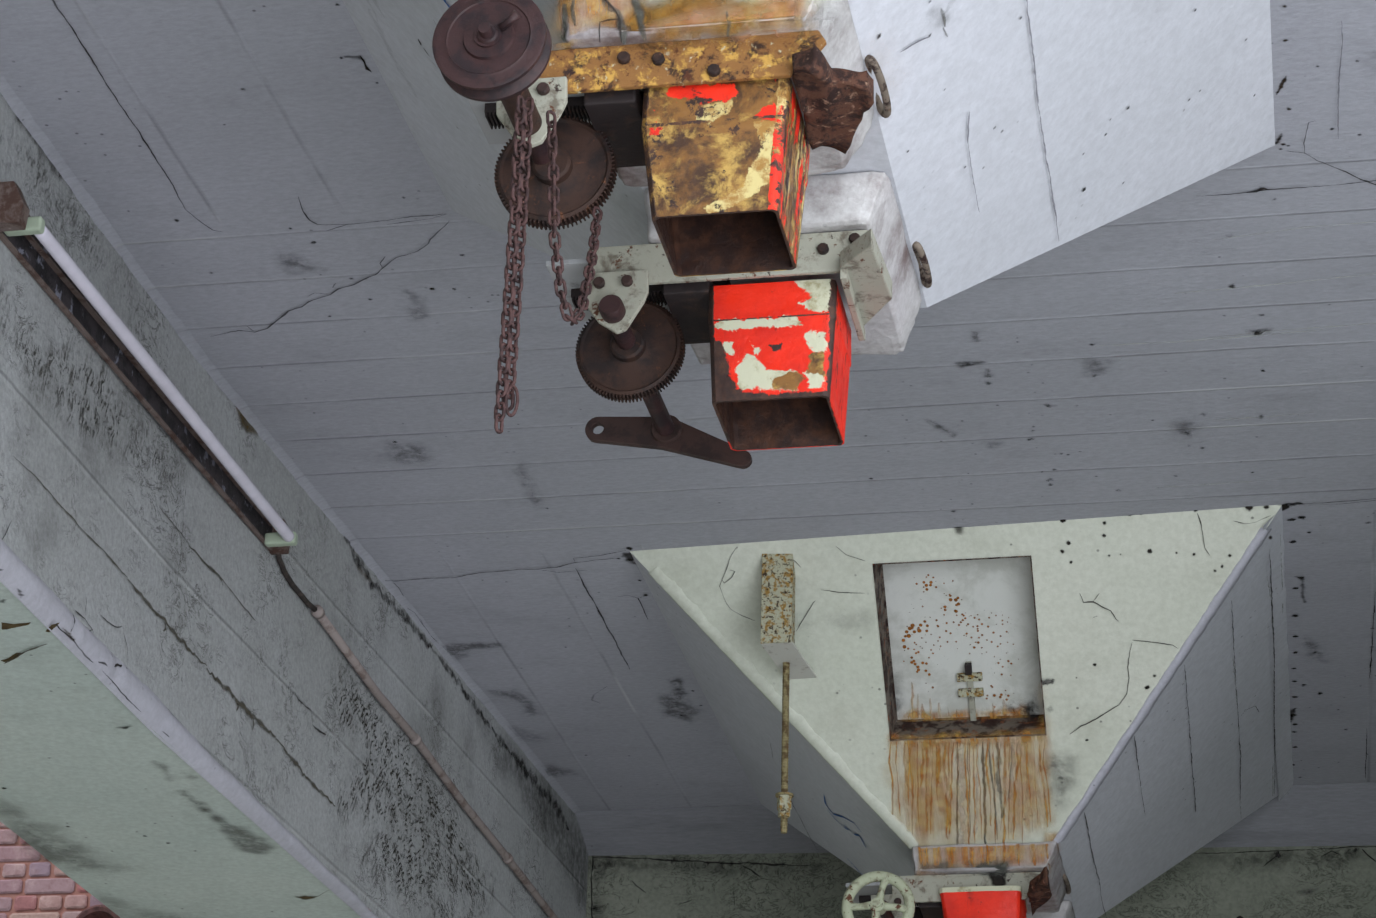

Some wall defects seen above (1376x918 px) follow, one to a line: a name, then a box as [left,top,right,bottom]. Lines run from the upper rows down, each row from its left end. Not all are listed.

crack [52,0,221,232]
crack [211,197,449,337]
crack [967,111,979,209]
crack [1026,0,1059,238]
crack [1208,35,1376,196]
leakage [237,408,257,433]
crack [4,457,335,806]
leakage [344,537,569,830]
rust [888,574,1056,870]
crack [1231,554,1276,794]
crack [1368,592,1376,678]